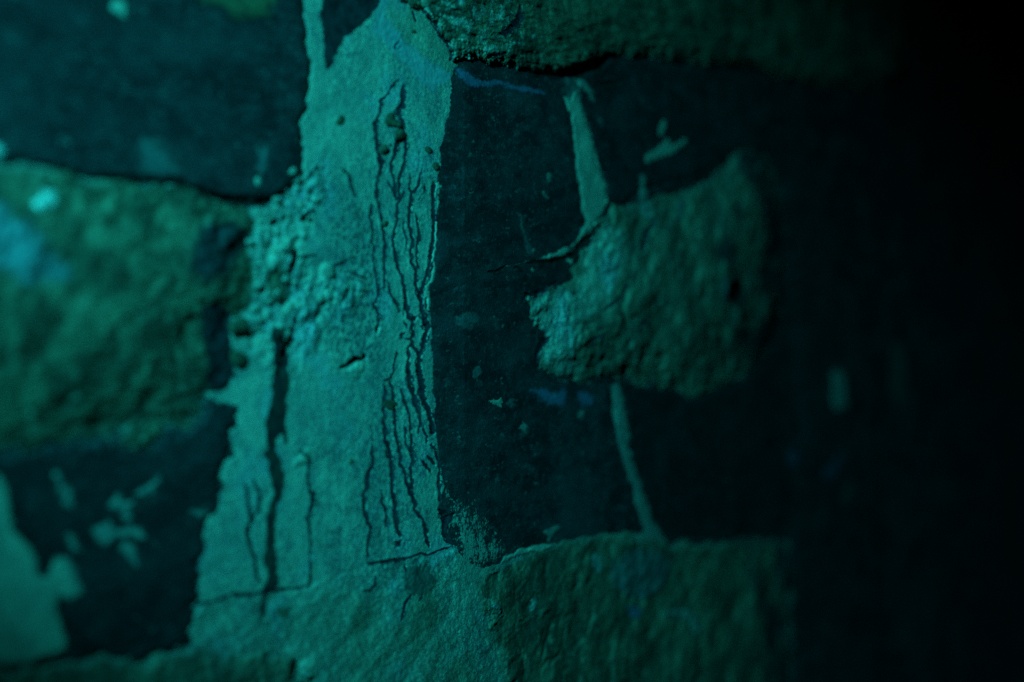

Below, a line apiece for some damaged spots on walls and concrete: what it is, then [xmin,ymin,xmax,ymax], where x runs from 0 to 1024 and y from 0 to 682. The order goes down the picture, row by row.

flaking render [519,78,608,272]
flaking render [423,222,438,313]
crack [35,78,455,621]
peeling [489,398,515,408]
flaking render [611,383,664,541]
peeling [92,474,161,567]
peeling [500,525,560,565]